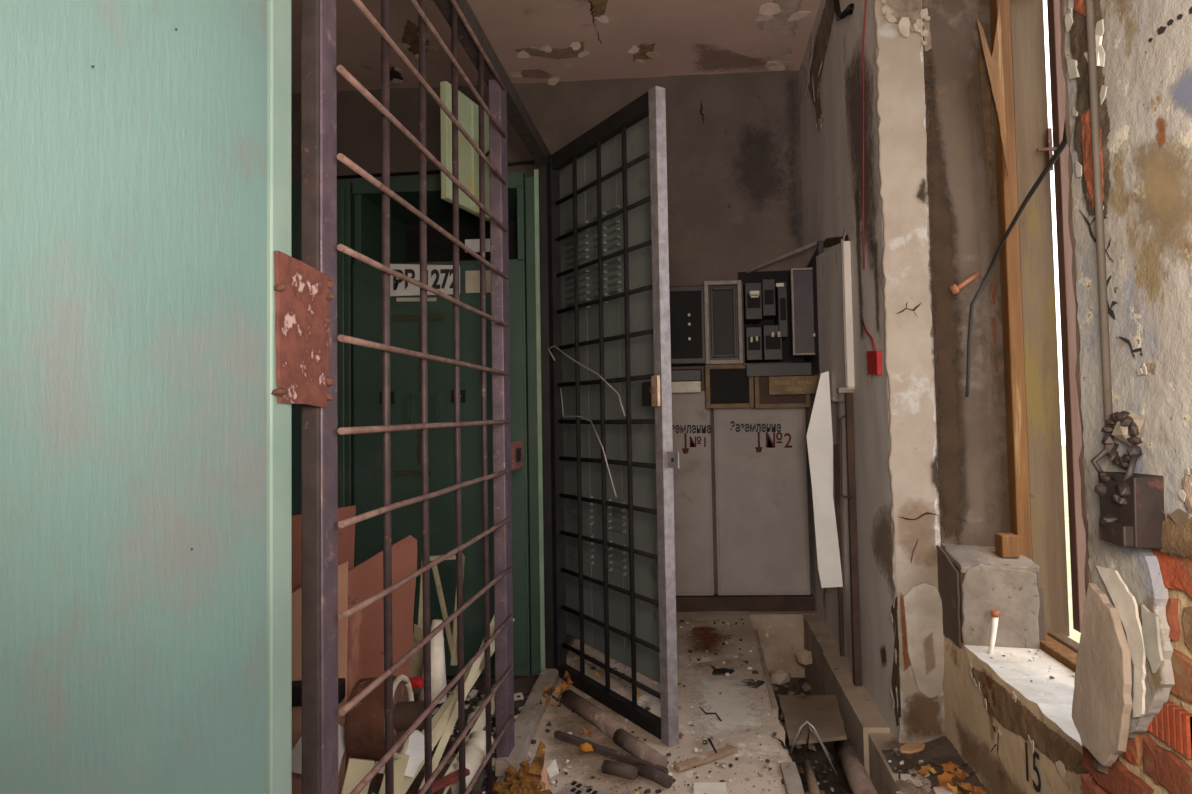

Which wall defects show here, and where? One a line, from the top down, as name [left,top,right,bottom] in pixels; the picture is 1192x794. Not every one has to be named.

crack [588,0,601,42]
spalling [591,0,609,23]
spalling [882,0,932,51]
peeling [509,42,589,85]
spalling [628,43,660,63]
peeling [755,0,835,132]
water stain [1134,143,1192,258]
spalling [1154,468,1192,557]
flaking render [969,566,1164,779]